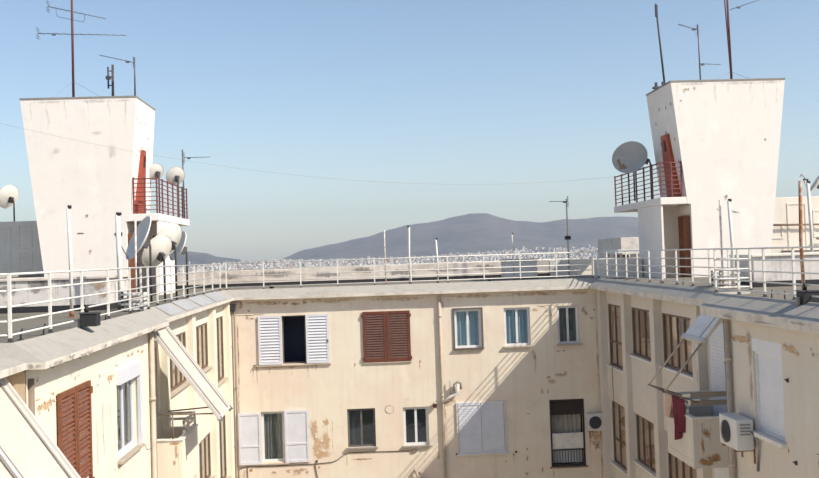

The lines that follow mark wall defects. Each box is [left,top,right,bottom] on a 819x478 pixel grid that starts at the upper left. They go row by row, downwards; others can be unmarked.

peeling [309,419,333,458]